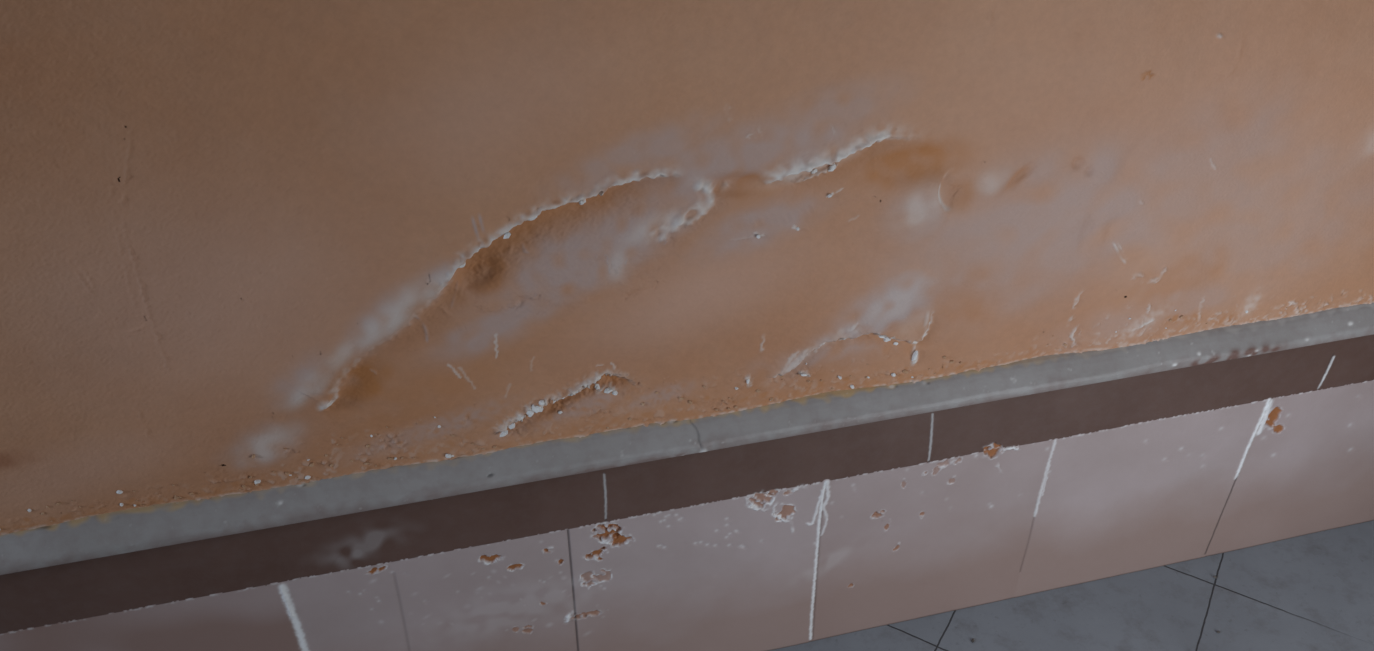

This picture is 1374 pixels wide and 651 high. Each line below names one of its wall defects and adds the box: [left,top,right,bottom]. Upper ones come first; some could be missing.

spalling [419,121,970,344]
spalling [0,280,1374,535]
spalling [362,564,389,577]
spalling [474,522,636,589]
crack [805,479,831,641]